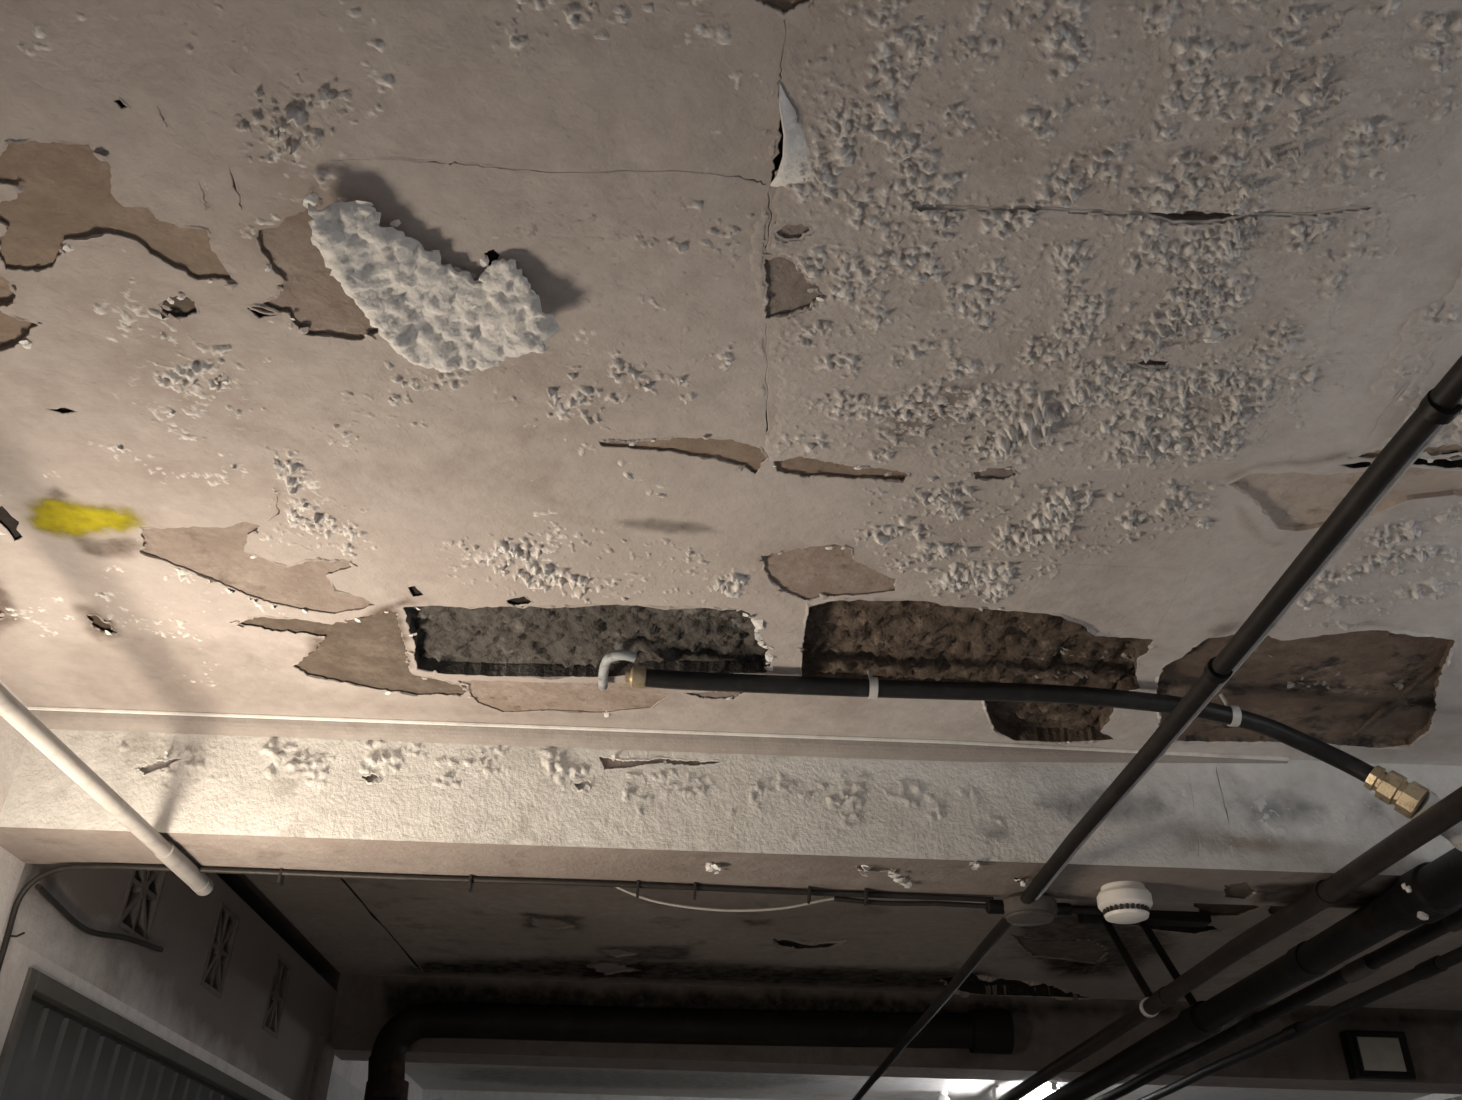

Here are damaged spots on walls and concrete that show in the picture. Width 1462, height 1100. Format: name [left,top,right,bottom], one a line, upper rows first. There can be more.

peeling [0,138,238,353]
peeling [245,186,379,342]
peeling [761,223,824,320]
peeling [597,436,911,483]
spalling [1225,449,1382,533]
spalling [1367,442,1462,519]
spalling [138,521,775,718]
spalling [760,544,1235,732]
spalling [981,701,1116,745]
spalling [1174,629,1457,750]
spalling [941,973,1093,1000]